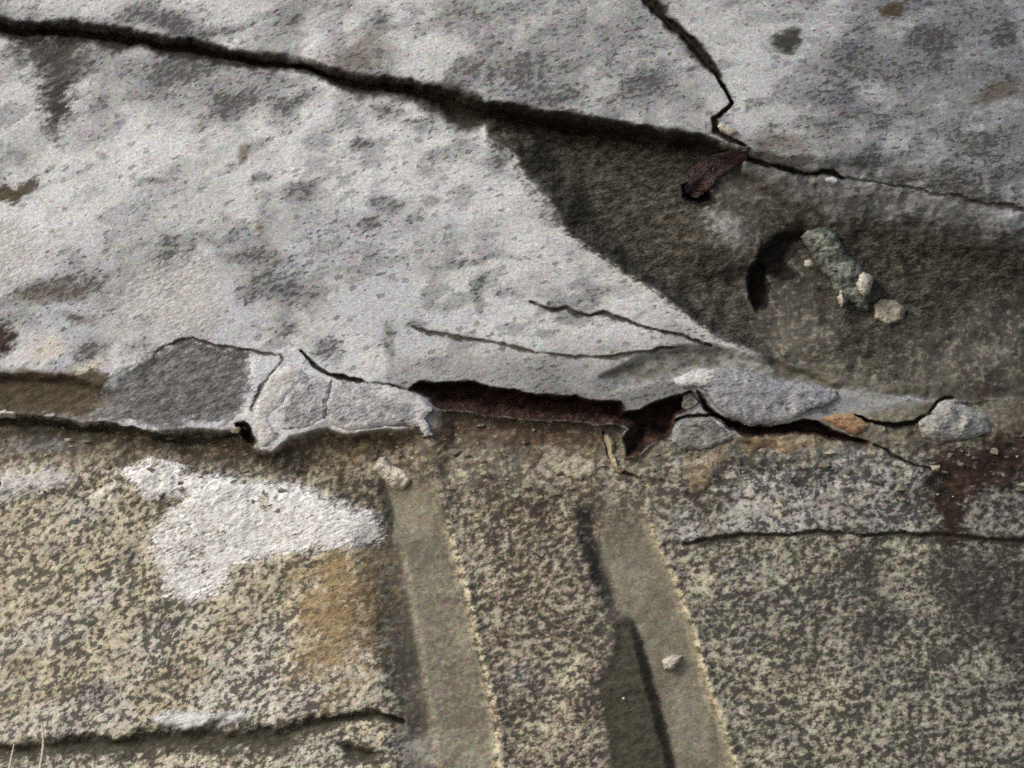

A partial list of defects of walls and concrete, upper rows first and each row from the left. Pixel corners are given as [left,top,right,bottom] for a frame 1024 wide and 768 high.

crack [0,0,1024,211]
crack [411,301,713,360]
spalling [0,339,433,447]
peeling [673,366,868,435]
damp [0,465,77,497]
damp [123,456,387,604]
crack [683,528,1024,546]